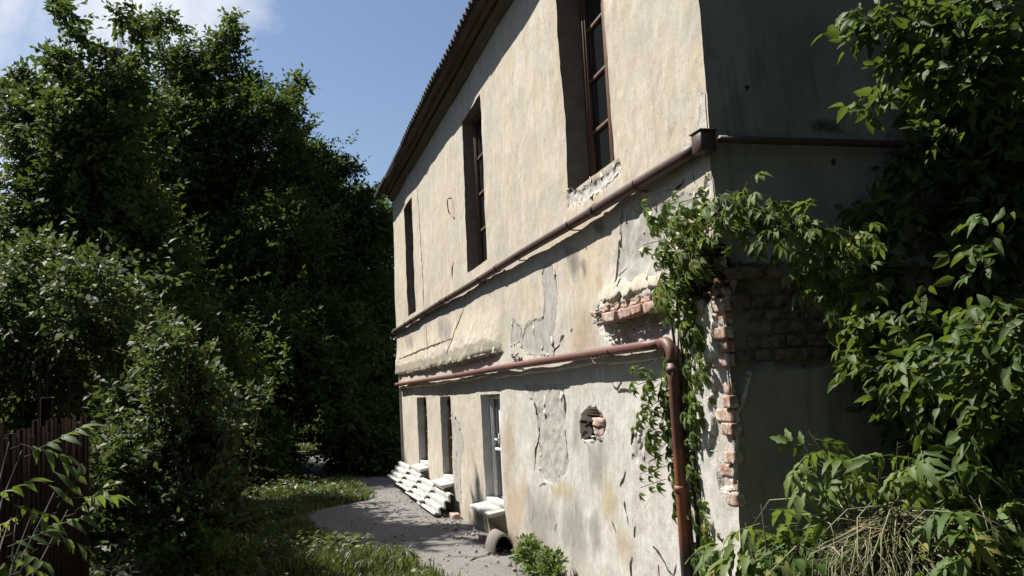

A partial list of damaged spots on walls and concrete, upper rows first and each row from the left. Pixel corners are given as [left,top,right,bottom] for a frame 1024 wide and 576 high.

spalling [566,162,622,209]
peeling [510,262,557,358]
spalling [589,172,714,343]
hole [580,406,606,444]
spalling [688,256,878,507]
crack [611,470,676,576]